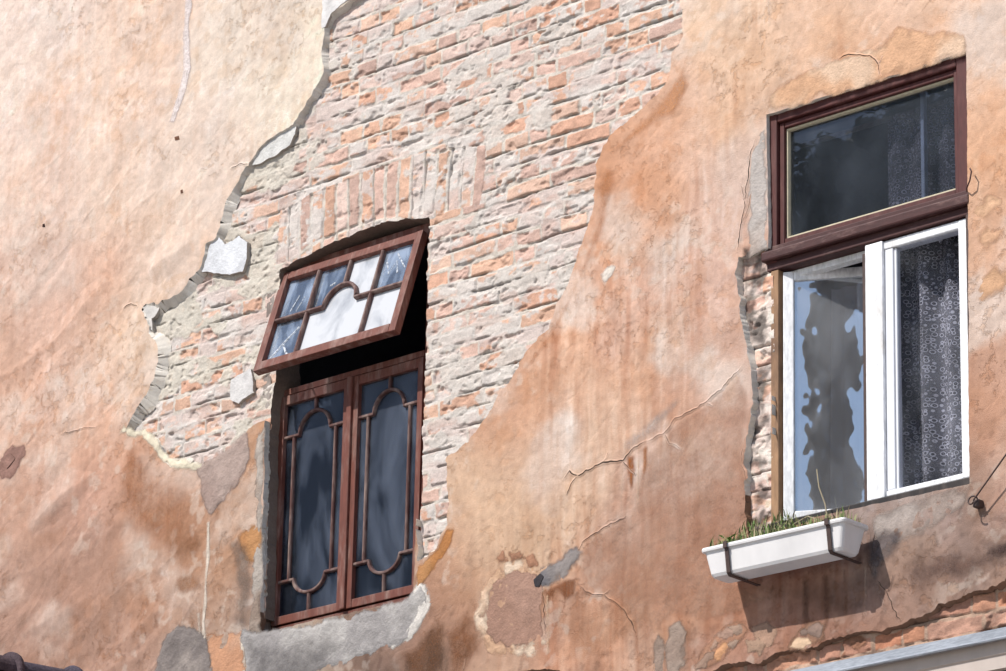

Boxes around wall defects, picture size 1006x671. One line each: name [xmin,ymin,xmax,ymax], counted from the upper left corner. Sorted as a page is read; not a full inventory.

crack [838,52,883,77]
crack [736,139,757,253]
spalling [121,0,683,671]
spalling [741,131,775,536]
peeling [0,445,26,479]
crack [562,365,742,496]
spalling [795,282,805,511]
crack [578,516,626,550]
damp [869,533,899,577]
crack [578,583,638,636]
spalling [695,587,1006,671]